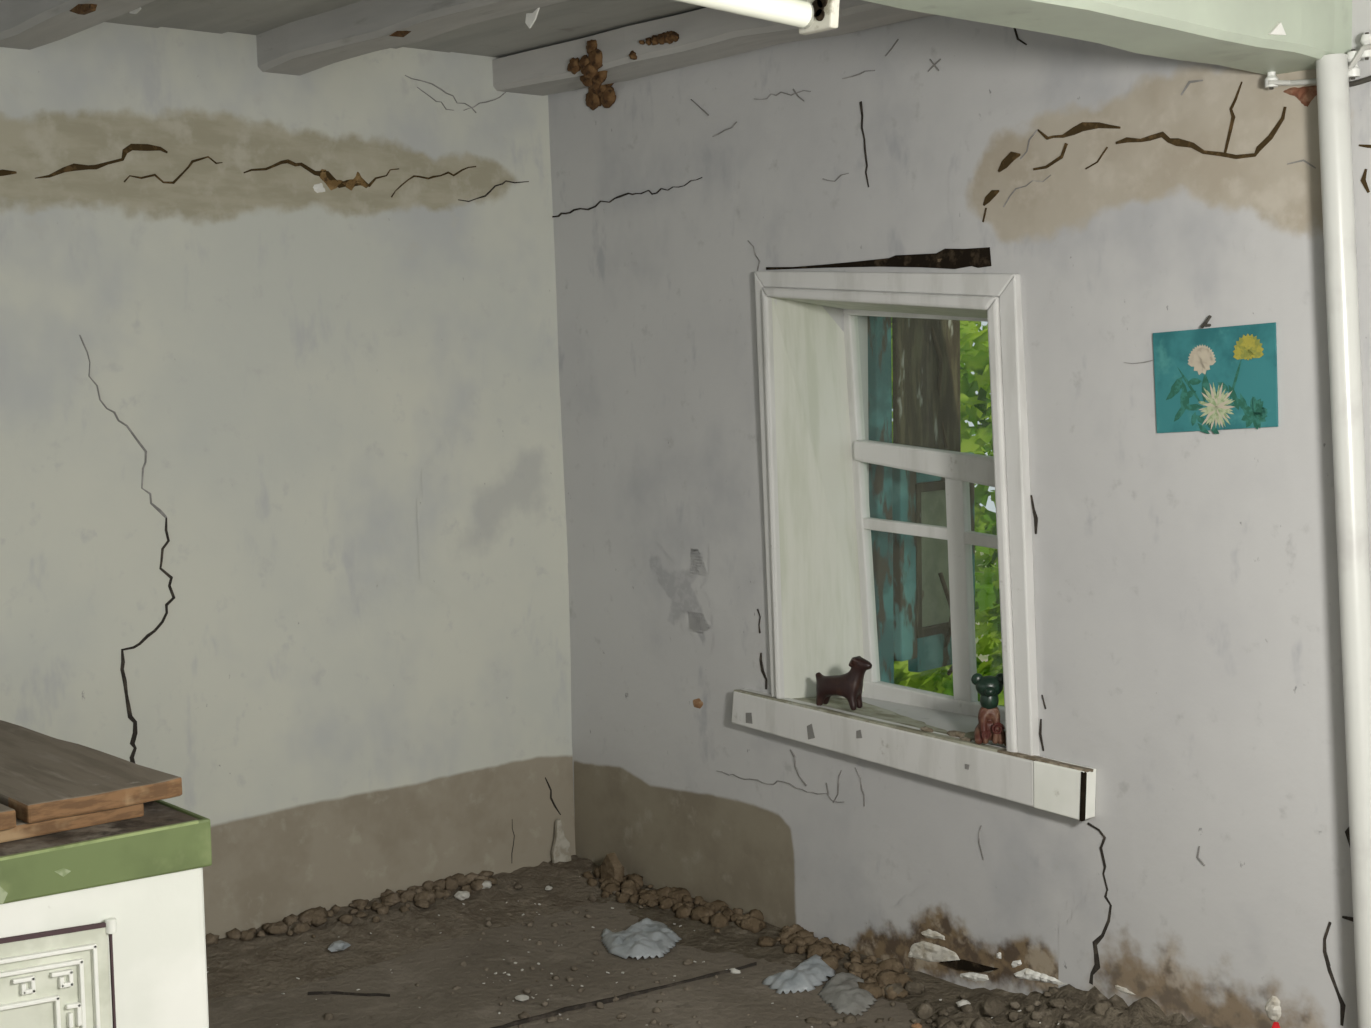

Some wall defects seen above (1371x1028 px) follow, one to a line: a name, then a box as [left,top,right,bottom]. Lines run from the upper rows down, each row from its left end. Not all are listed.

corrosion [567,39,616,110]
corrosion [629,31,679,60]
crack [0,144,529,202]
crack [552,177,703,218]
crack [982,80,1316,222]
crack [79,335,175,763]
crack [717,749,865,806]
crack [977,825,985,860]
crack [1343,827,1351,846]
crack [1087,822,1112,985]
peeling [908,929,1067,985]
crack [1323,916,1353,1026]